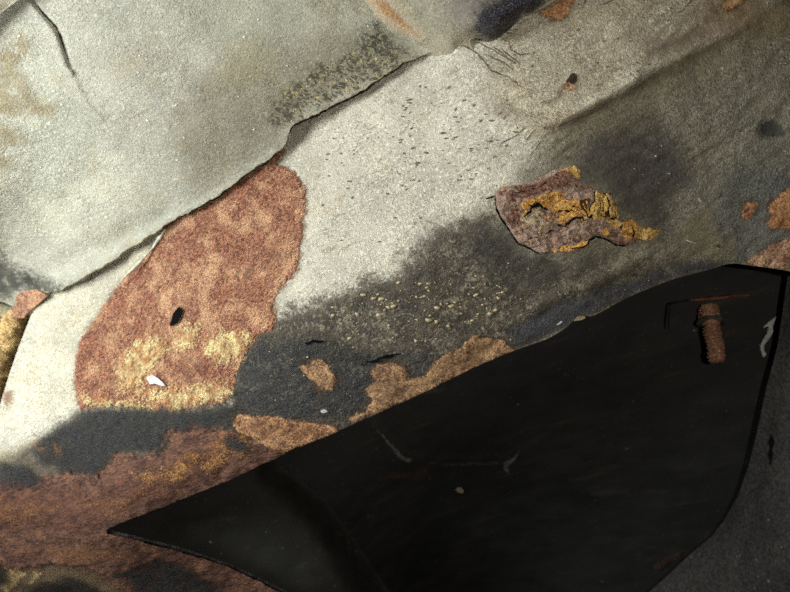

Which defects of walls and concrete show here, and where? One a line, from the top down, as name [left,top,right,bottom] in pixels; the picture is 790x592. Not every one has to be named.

rust [538,0,575,22]
leakage [267,21,406,125]
spalling [398,97,428,190]
spalling [440,96,518,170]
rust [486,165,659,255]
rust [741,189,790,270]
rust [73,148,308,413]
leakage [228,207,735,430]
rust [298,356,341,392]
rust [349,335,514,422]
rust [0,414,337,592]